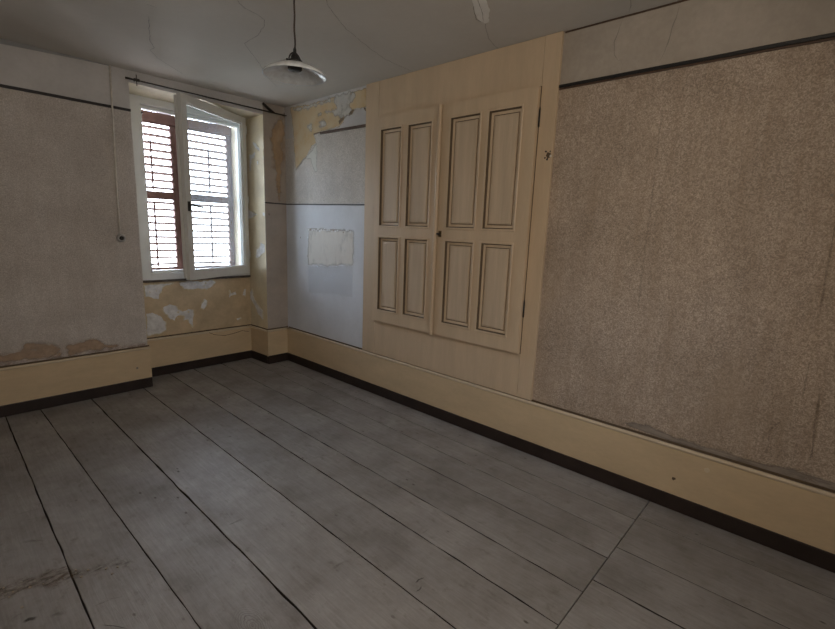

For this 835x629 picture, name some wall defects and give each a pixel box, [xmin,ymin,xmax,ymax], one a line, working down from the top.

peeling [143,279,216,337]